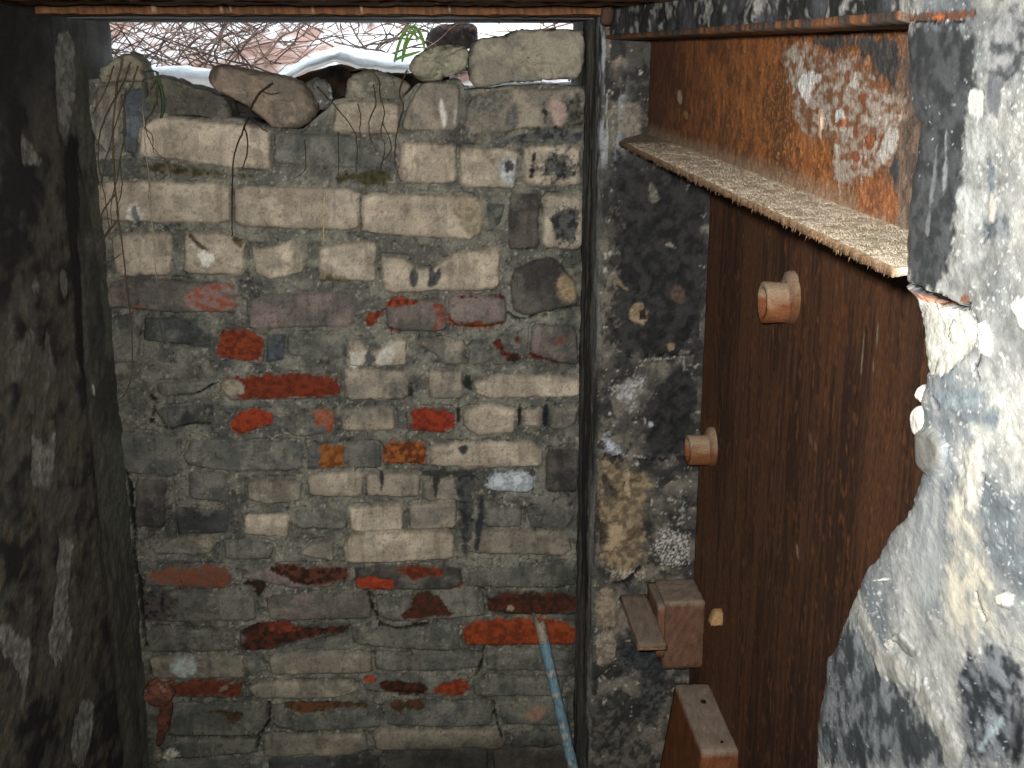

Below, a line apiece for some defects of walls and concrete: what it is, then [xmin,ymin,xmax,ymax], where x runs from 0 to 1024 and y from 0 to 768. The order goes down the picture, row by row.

rust [851,170,904,226]
peeling [918,300,997,380]